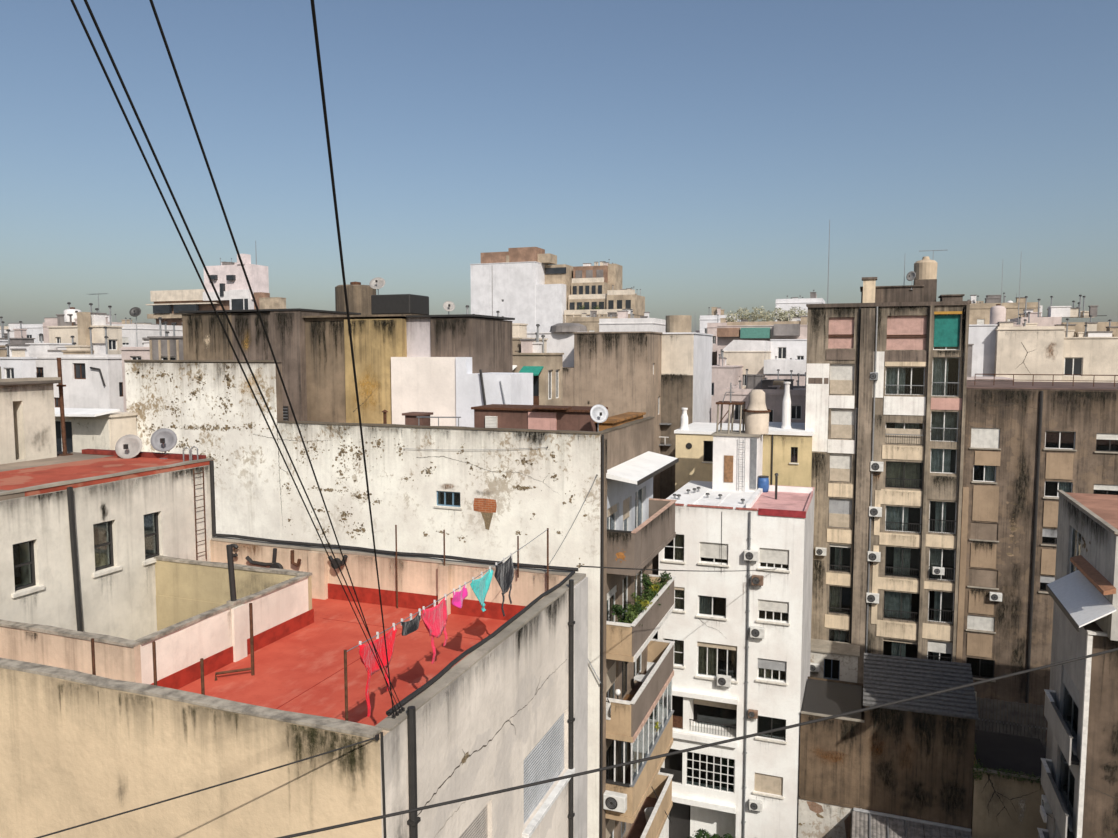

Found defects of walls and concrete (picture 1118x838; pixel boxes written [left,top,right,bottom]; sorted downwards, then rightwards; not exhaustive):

damp [188,313,292,340]
damp [310,320,393,345]
peeling [127,365,269,484]
peeling [282,425,414,545]
peeling [499,454,542,491]
damp [1012,452,1029,520]
spalling [473,498,497,530]
damp [996,594,1019,626]
crack [418,659,567,835]
damp [872,708,969,751]